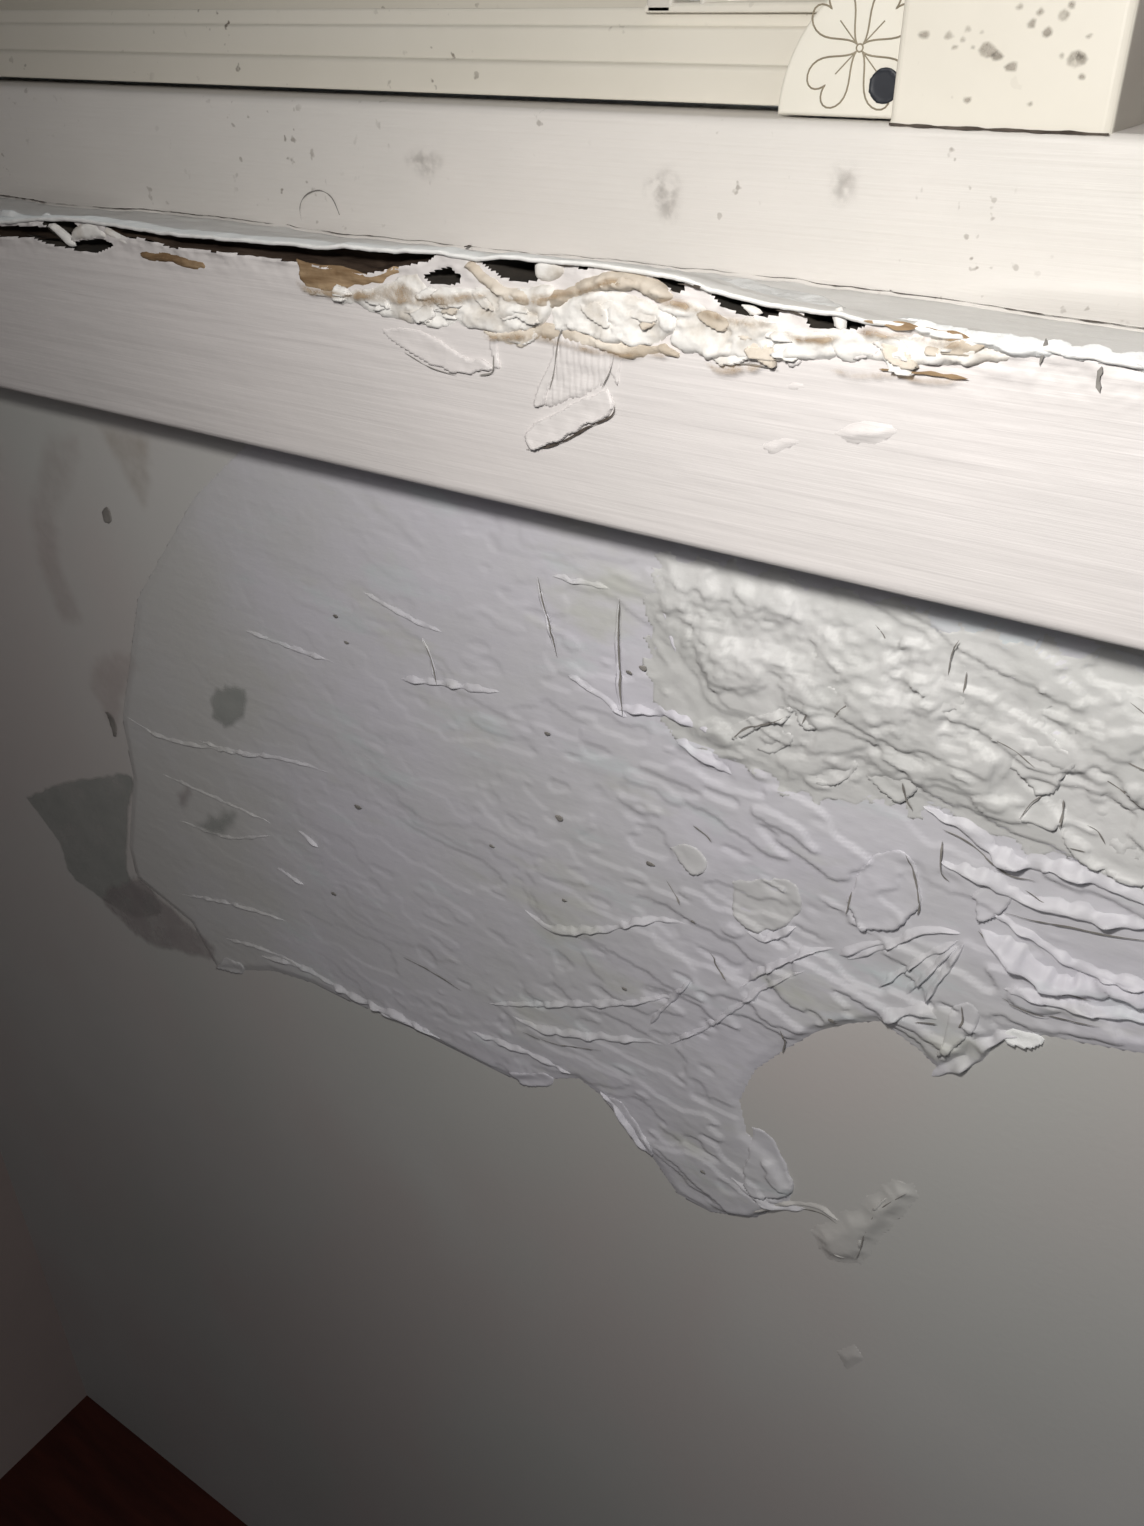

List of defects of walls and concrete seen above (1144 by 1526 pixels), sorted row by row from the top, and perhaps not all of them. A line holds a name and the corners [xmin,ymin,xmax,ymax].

peeling [304,261,1144,450]
peeling [102,507,112,524]
crack [536,576,557,656]
crack [614,599,622,710]
crack [948,641,967,692]
crack [733,705,846,738]
crack [991,738,1105,852]
crack [1107,763,1144,810]
crack [906,830,1144,941]
crack [916,1007,963,1027]
crack [1002,979,1097,1027]